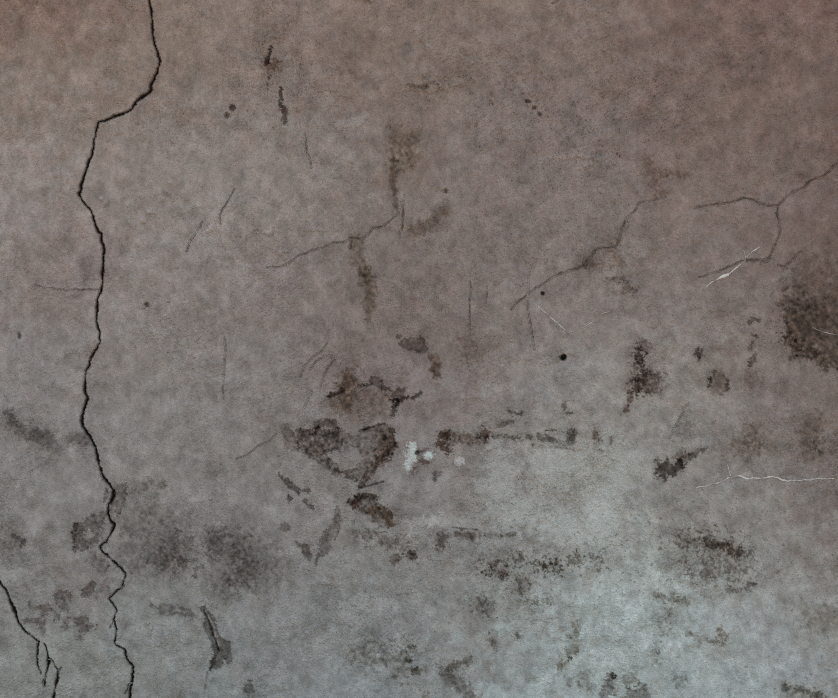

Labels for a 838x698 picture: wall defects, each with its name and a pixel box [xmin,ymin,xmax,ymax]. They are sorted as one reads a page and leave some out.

crack [267,212,399,268]
crack [510,196,666,334]
crack [694,162,838,287]
crack [34,0,161,698]
water stain [318,351,394,428]
water stain [343,398,652,657]
crack [0,581,62,698]
water stain [329,619,495,698]
water stain [547,616,591,677]